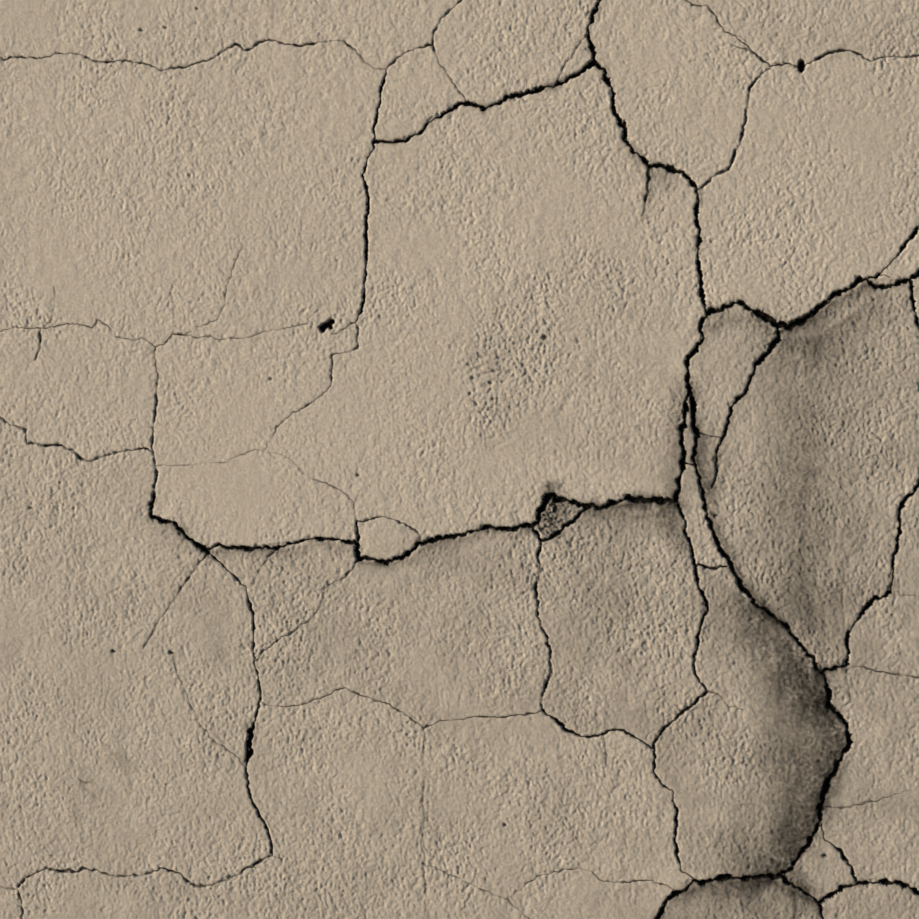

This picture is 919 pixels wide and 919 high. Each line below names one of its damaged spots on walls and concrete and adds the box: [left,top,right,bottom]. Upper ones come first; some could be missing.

crack [1,39,317,72]
crack [340,0,919,489]
crack [0,320,109,361]
crack [0,417,98,462]
crack [127,427,158,489]
spalling [537,501,575,536]
crack [148,315,919,919]
crack [18,867,109,919]
crack [120,867,234,888]